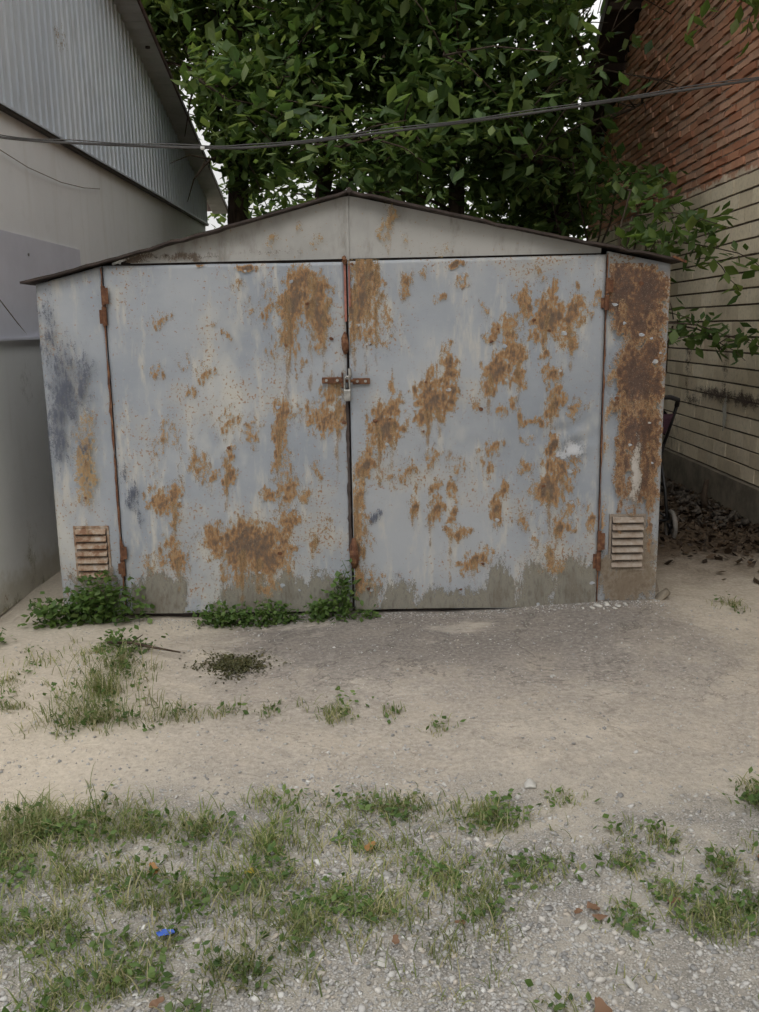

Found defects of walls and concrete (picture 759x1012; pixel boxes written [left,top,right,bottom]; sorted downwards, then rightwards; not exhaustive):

rust [348,204,427,371]
rust [438,246,470,290]
rust [73,411,100,506]
rust [142,263,347,601]
rust [352,263,671,601]